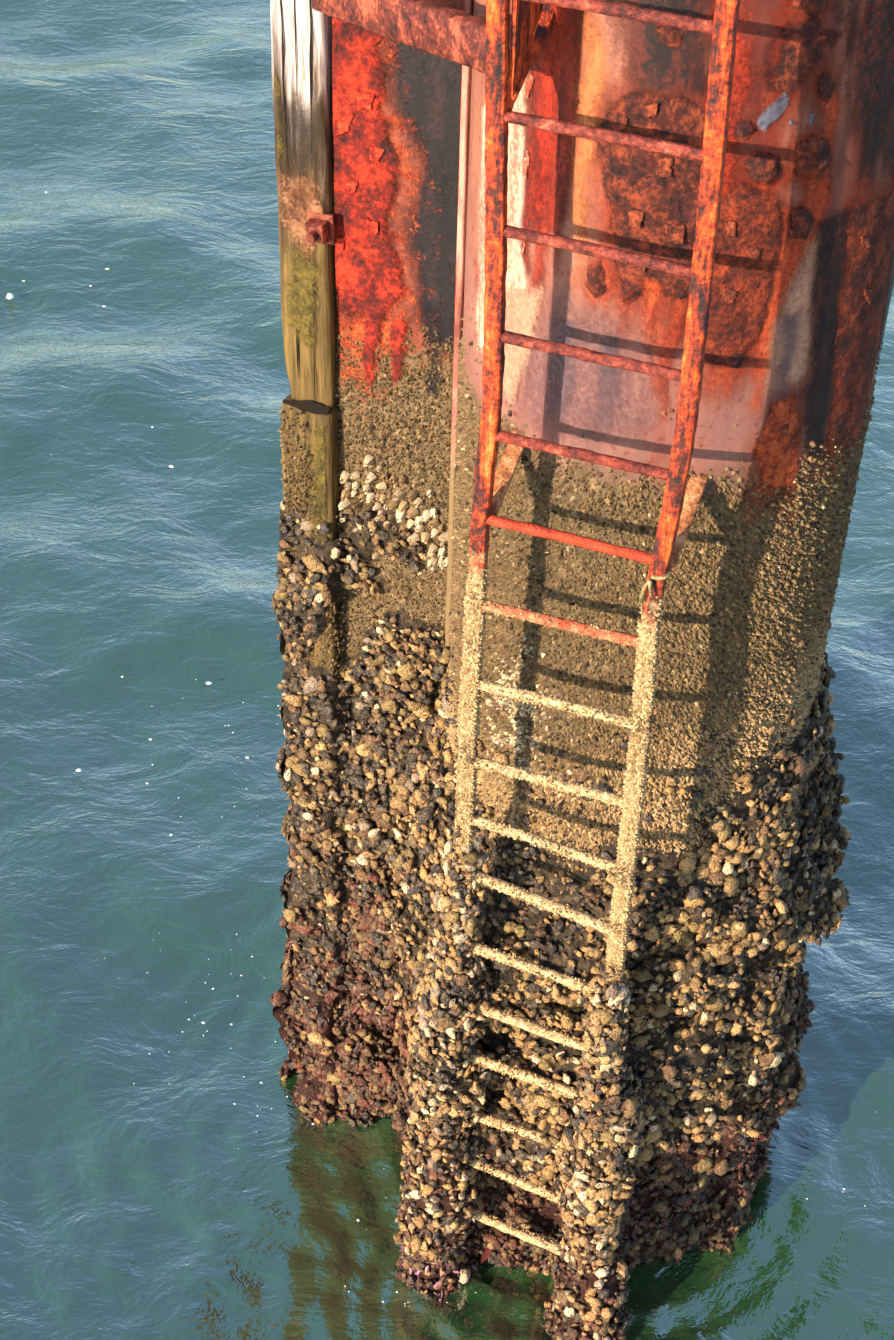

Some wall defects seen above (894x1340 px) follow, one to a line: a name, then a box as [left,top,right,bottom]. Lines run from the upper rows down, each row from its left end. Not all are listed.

rust [279,17,434,401]